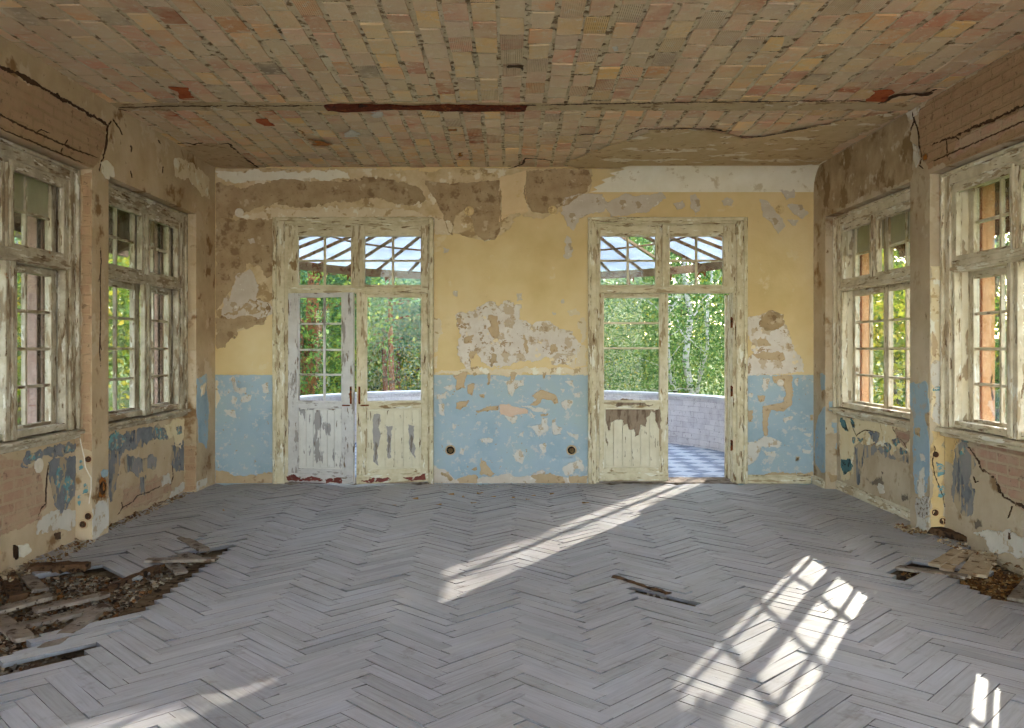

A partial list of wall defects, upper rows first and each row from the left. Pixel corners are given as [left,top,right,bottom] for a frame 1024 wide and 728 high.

crack [0,66,323,178]
crack [528,89,1024,169]
peeling [215,168,700,349]
peeling [361,293,588,483]
peeling [748,310,804,465]
peeling [765,266,1024,527]
crack [968,447,1024,518]